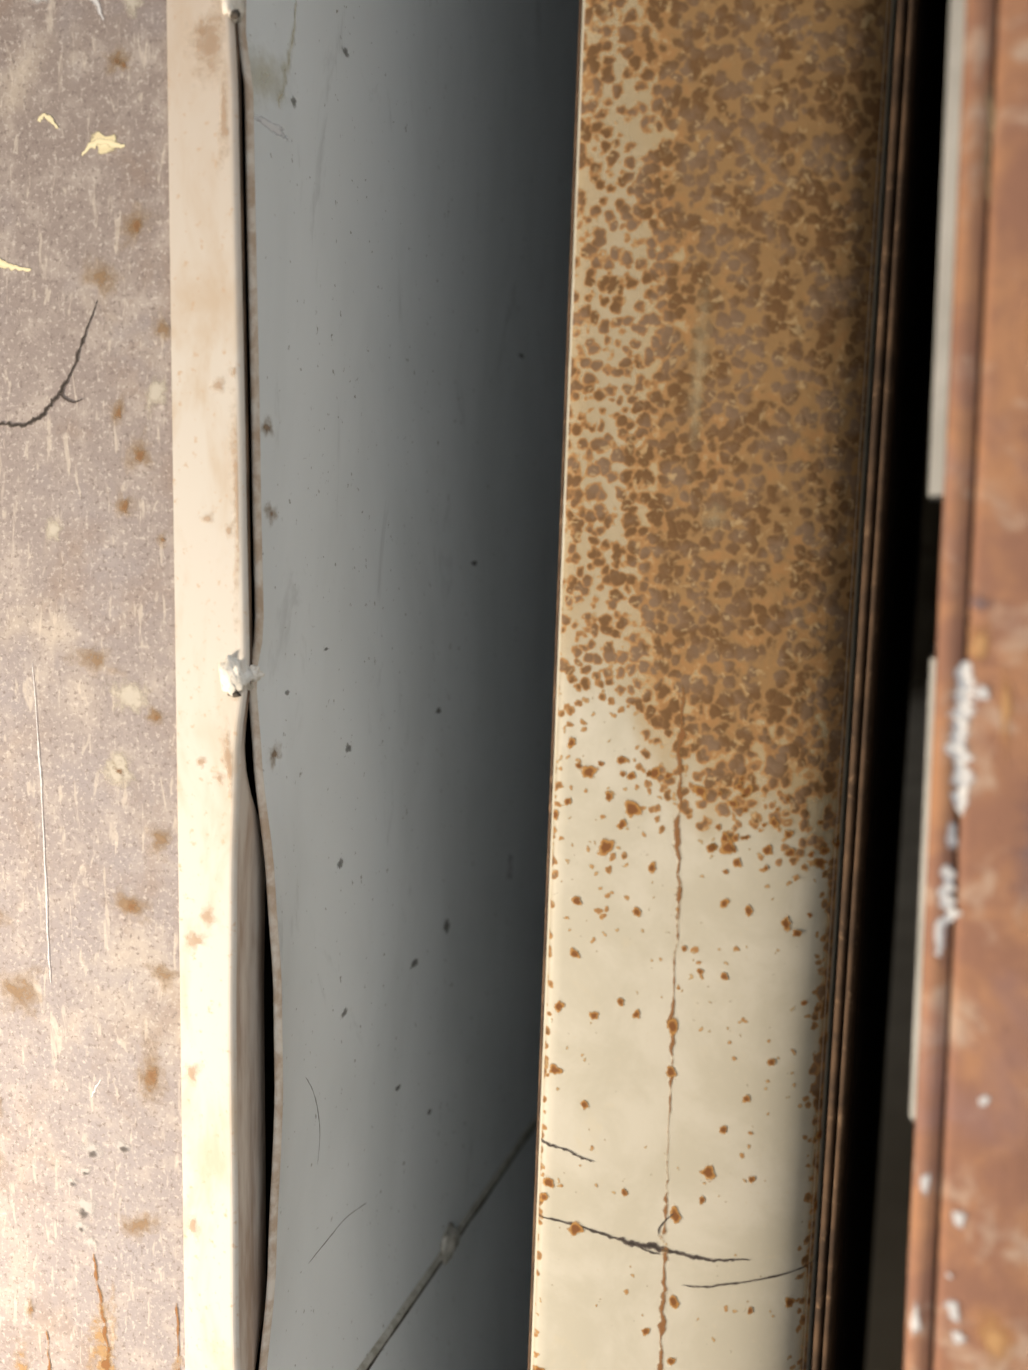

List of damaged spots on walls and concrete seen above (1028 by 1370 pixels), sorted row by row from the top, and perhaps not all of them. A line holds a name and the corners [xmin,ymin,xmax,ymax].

crack [0,300,98,428]
rust [548,0,892,1370]
rust [970,634,988,658]
rust [536,976,584,1276]
crack [541,1139,594,1162]
crack [538,1214,814,1288]
rust [93,1254,114,1370]